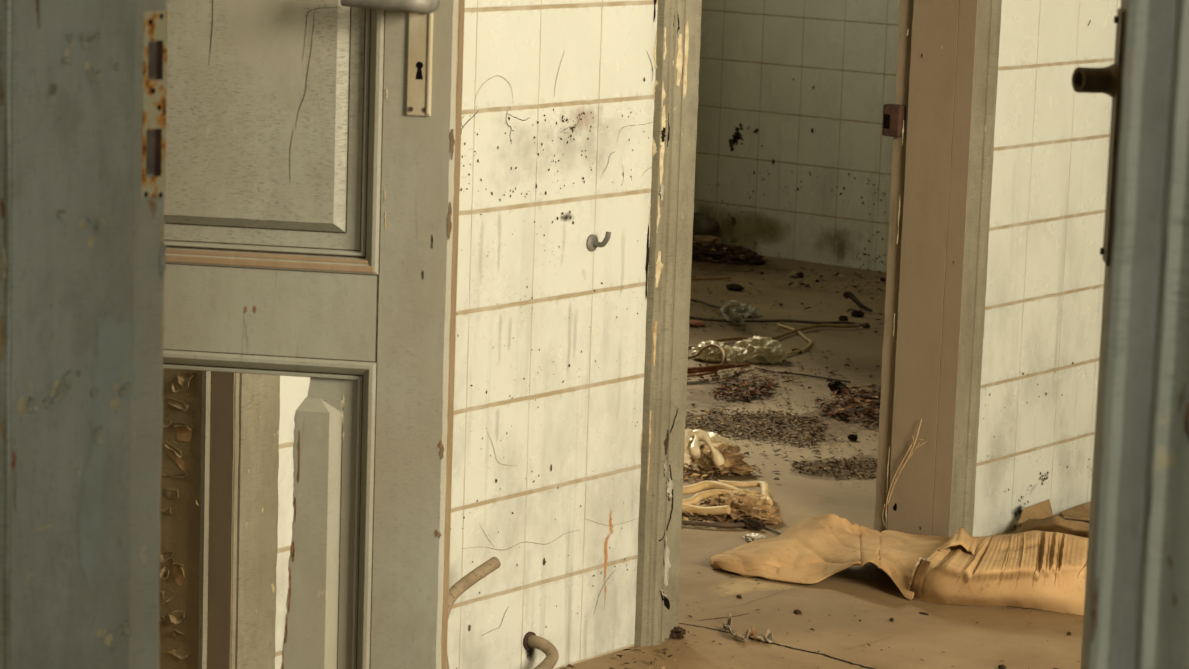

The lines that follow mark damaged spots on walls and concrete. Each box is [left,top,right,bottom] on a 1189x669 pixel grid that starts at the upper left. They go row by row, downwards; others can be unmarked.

peeling [160,371,196,516]
crack [658,409,678,586]
peeling [159,551,192,659]